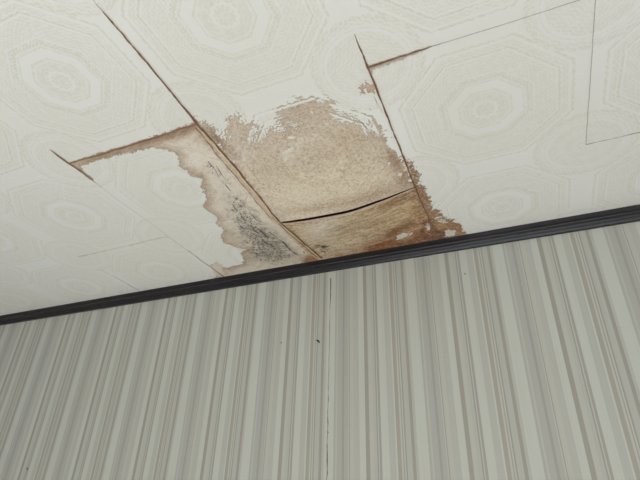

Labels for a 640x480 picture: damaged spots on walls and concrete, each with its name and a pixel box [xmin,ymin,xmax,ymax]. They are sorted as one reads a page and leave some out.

crack [51,12,439,260]
leakage [70,94,466,278]